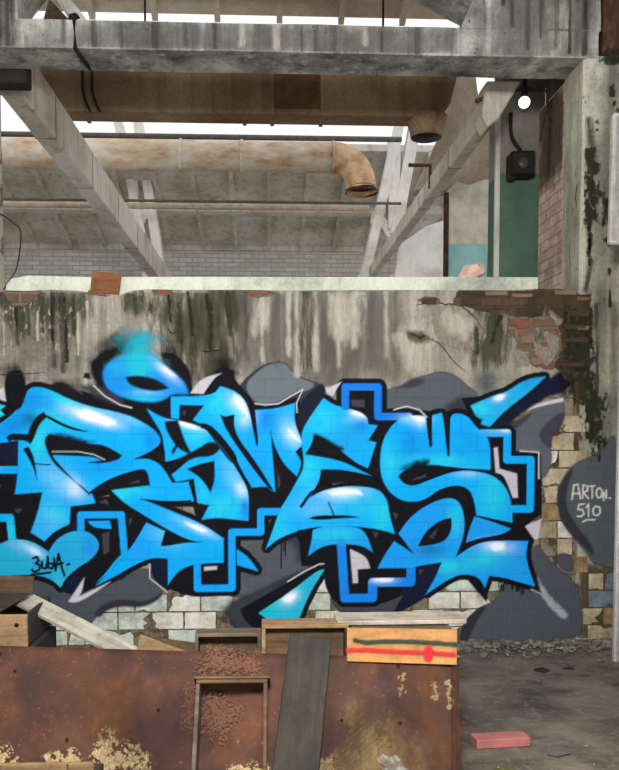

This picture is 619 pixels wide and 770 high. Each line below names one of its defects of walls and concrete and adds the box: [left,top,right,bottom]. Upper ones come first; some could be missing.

flaking render [3,290,42,307]
water stain [0,291,79,373]
water stain [167,291,194,343]
water stain [205,293,214,348]
water stain [224,291,387,376]
flaking render [418,289,596,382]
peeling [526,416,614,639]